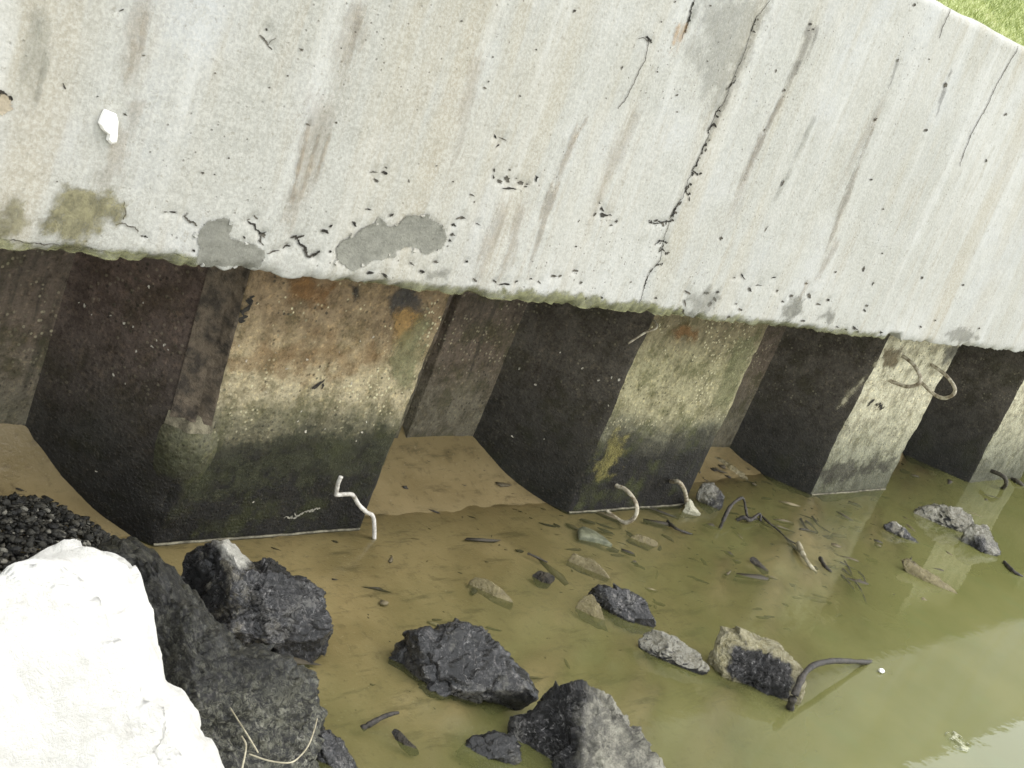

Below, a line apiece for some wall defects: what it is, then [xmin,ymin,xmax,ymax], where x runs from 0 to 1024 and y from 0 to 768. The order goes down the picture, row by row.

crack [618,36,652,108]
crack [641,1,770,299]
crack [960,48,1018,163]
crack [248,219,320,258]
peeling [334,214,447,272]
spalling [164,218,265,434]